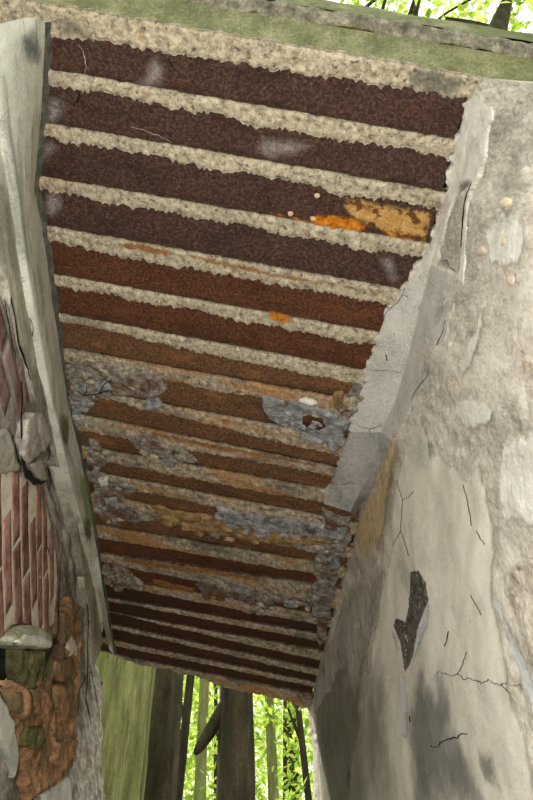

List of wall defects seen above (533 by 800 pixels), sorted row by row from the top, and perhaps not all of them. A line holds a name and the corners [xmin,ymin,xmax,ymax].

corrosion [293,200,429,239]
corrosion [190,255,321,283]
corrosion [269,311,289,323]
crack [4,297,51,491]
spalling [262,383,364,454]
corrosion [302,415,325,431]
spalling [0,295,83,800]
spalling [86,435,352,648]
crack [392,479,414,556]
crack [463,485,485,545]
flaking render [392,570,429,671]
crack [437,653,523,694]